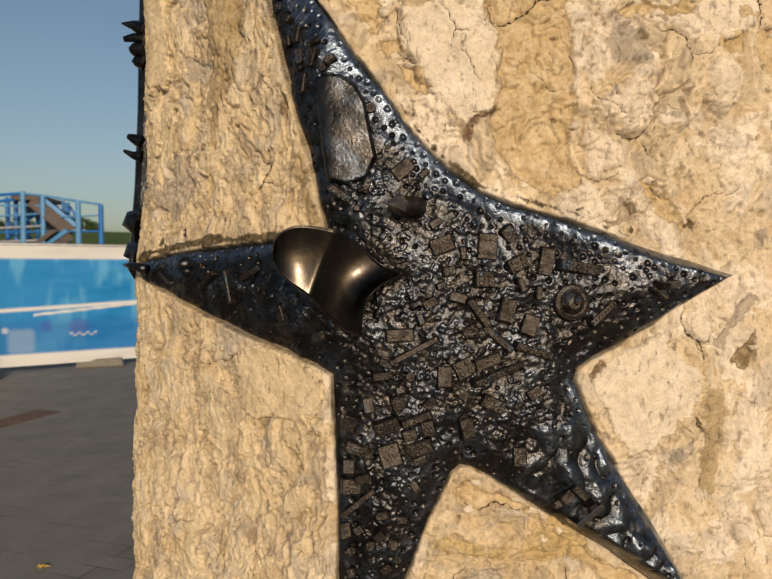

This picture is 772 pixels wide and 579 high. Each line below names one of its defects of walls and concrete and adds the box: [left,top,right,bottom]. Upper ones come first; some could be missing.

crack [440,2,478,77]
crack [487,0,549,27]
crack [653,23,715,68]
crack [681,302,710,380]